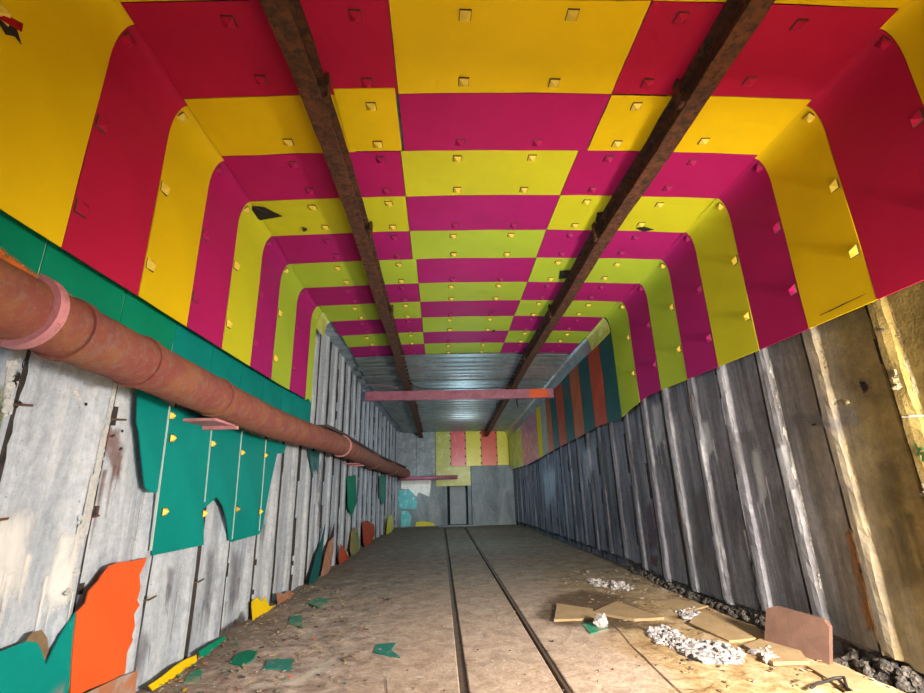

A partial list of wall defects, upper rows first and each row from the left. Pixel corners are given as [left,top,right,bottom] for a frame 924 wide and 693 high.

corrosion [97,430,122,509]
leakage [880,461,924,584]